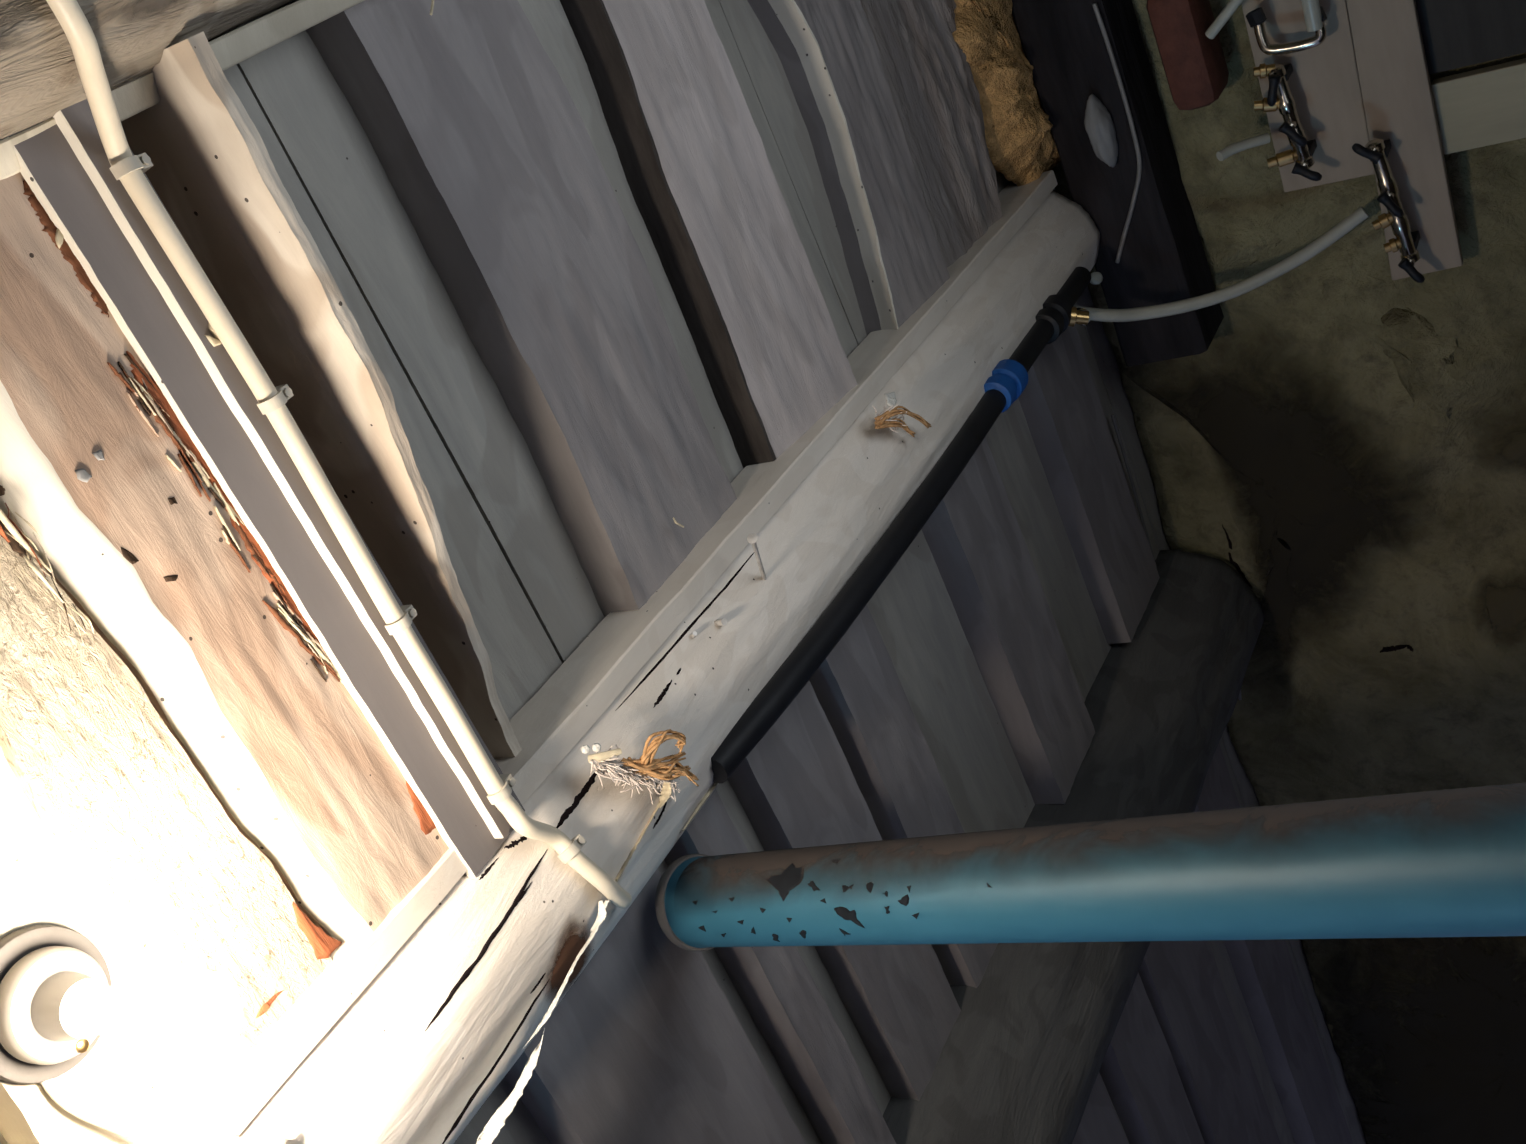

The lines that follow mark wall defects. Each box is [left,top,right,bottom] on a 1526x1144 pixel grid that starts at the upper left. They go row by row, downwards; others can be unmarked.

crack [425,770,607,1031]
peeling [767,863,820,902]
peeling [834,882,909,936]